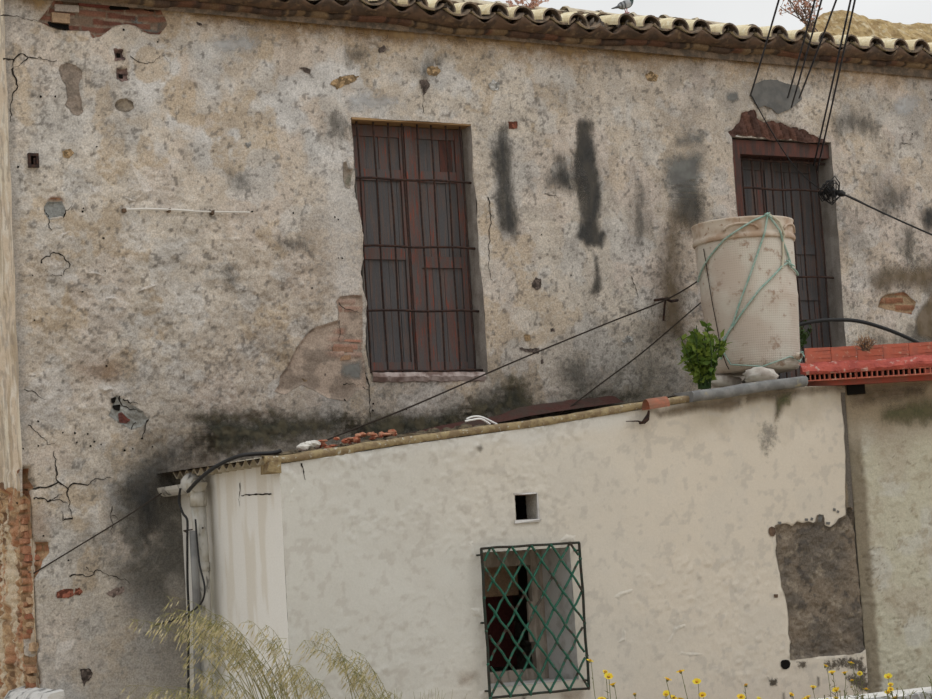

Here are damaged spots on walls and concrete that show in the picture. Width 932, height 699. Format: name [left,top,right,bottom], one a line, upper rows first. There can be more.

spalling [39,1,167,38]
crack [3,53,55,121]
spalling [59,63,83,115]
leakage [494,130,517,234]
leakage [549,119,605,246]
spalling [274,295,367,401]
leakage [593,258,601,293]
spalling [878,292,916,315]
spalling [109,395,149,437]
crack [16,425,111,521]
spalling [769,392,865,669]
spalling [0,469,49,699]